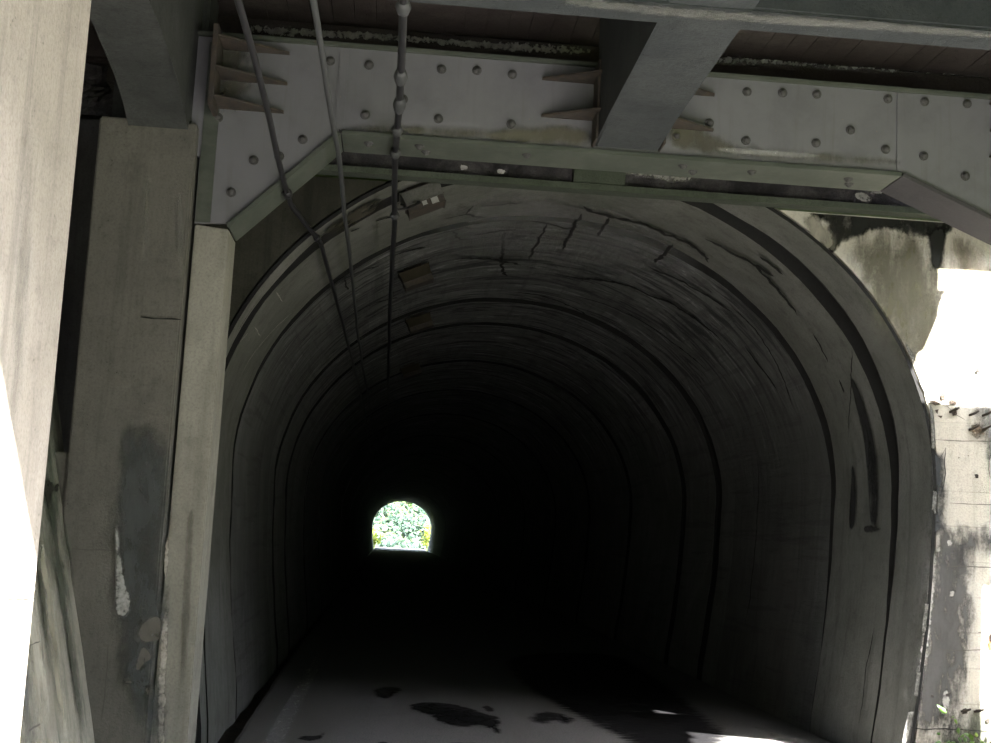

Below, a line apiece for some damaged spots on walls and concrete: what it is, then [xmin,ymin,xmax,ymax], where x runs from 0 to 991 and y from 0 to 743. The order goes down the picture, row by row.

crack [446,203,798,408]
damp [806,213,952,269]
spalling [918,381,957,449]
damp [970,277,991,459]
damp [23,504,83,742]
damp [115,430,169,743]
damp [183,511,193,651]
damp [916,451,991,743]
spalling [902,712,913,743]